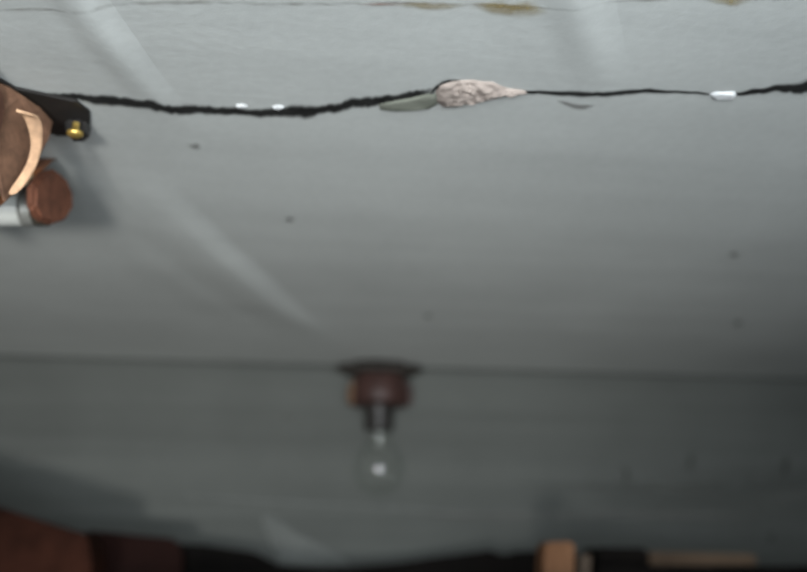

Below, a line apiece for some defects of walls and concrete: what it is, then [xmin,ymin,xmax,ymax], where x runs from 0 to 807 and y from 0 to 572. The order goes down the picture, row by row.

crack [53,90,438,118]
crack [526,81,807,108]